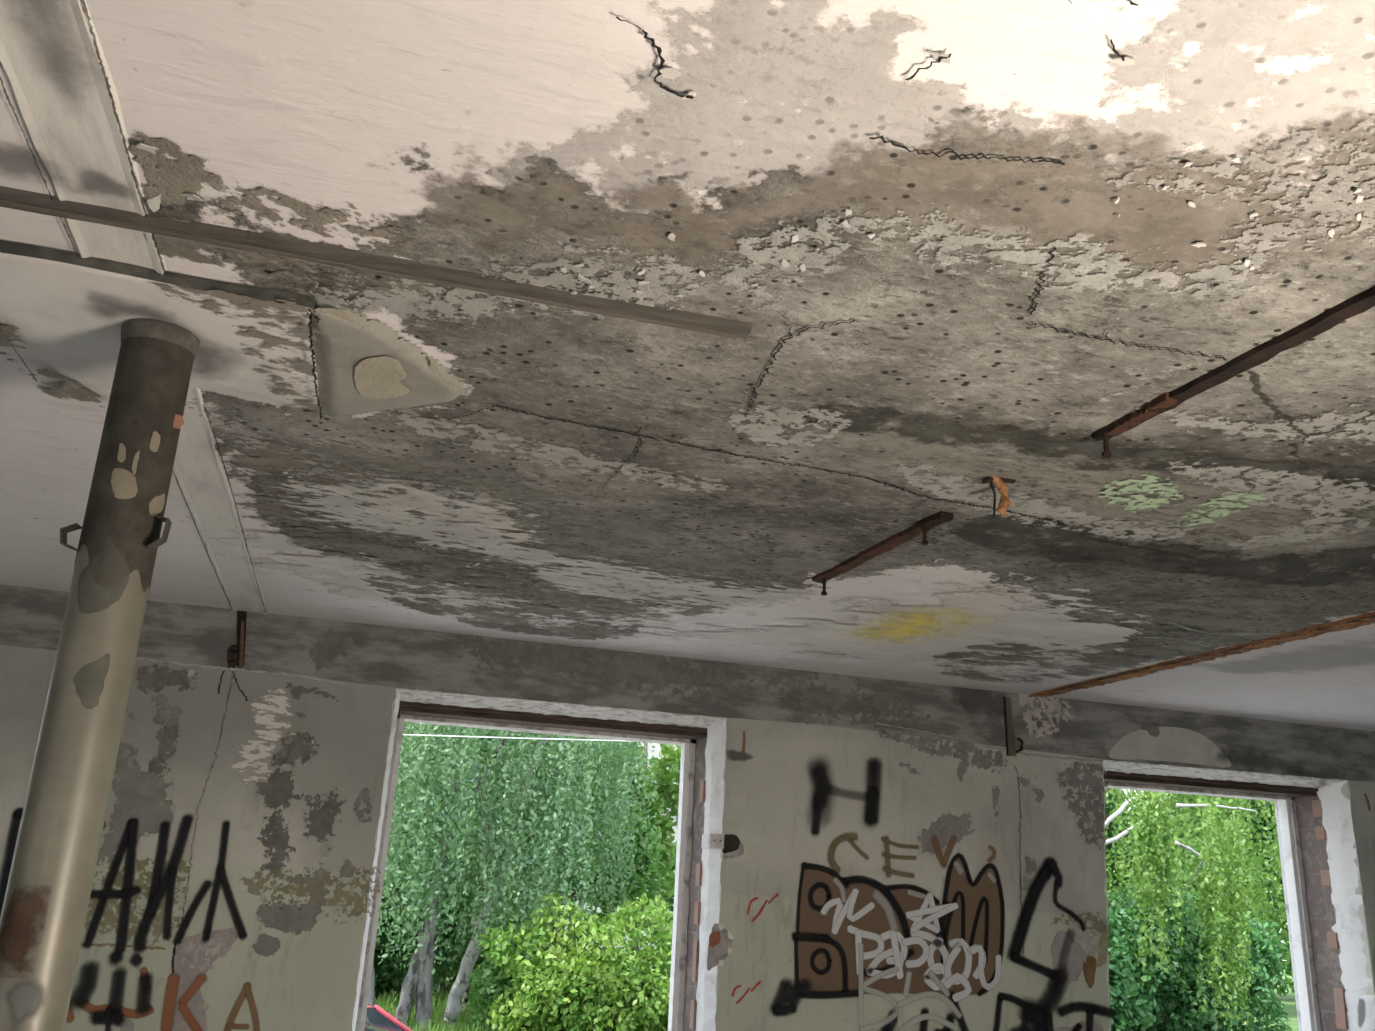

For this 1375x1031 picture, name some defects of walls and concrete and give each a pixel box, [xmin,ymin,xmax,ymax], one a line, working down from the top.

crack [616,17,694,99]
crack [1110,39,1125,61]
peeling [128,132,432,298]
peeling [148,280,333,418]
peeling [211,432,922,707]
water stain [145,107,1375,668]
crack [386,405,1230,568]
peeling [844,428,1375,554]
corrosion [1106,392,1178,436]
crack [1027,247,1375,478]
corrosion [1040,616,1375,697]
peeling [84,630,381,1031]